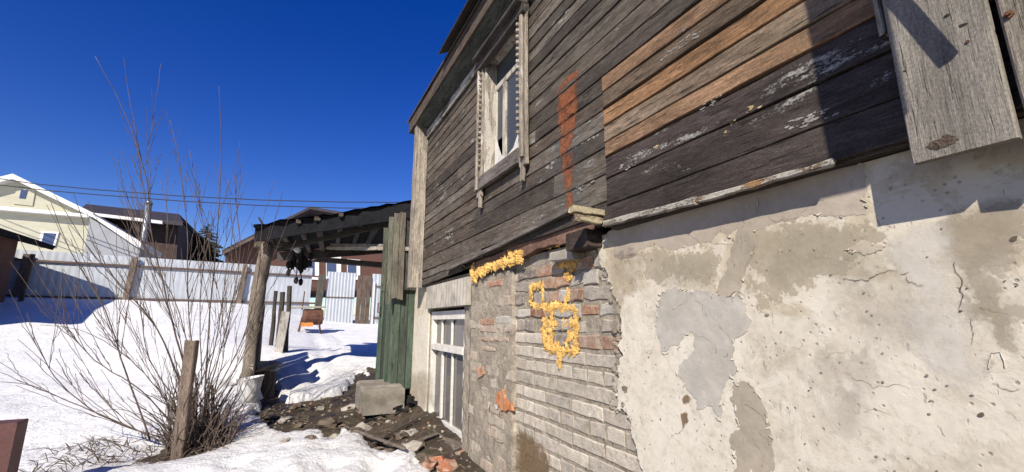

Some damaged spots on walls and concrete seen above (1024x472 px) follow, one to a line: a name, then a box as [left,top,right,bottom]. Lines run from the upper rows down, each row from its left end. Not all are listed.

corrosion [557,70,578,214]
peeling [785,107,839,130]
peeling [587,163,891,472]
crack [843,270,924,286]
crack [953,262,1009,345]
spalling [488,389,515,415]